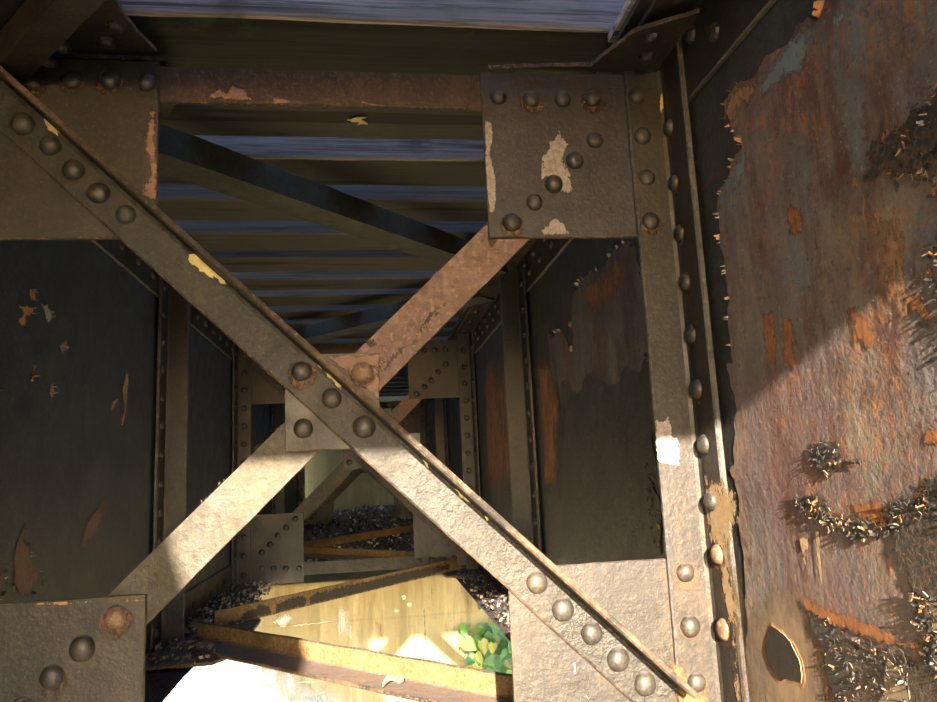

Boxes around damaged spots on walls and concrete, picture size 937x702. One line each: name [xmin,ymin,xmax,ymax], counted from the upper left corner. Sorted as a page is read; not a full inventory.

corrosion [724,83,756,122]
peeling [485,121,496,212]
peeling [541,130,573,193]
peeling [542,219,569,236]
corrosion [763,311,797,369]
peeling [713,0,937,702]
corrosion [847,307,879,349]
corrosion [538,359,559,484]
corrosion [924,428,937,444]
corrosion [822,495,890,538]
corrosion [803,598,925,652]